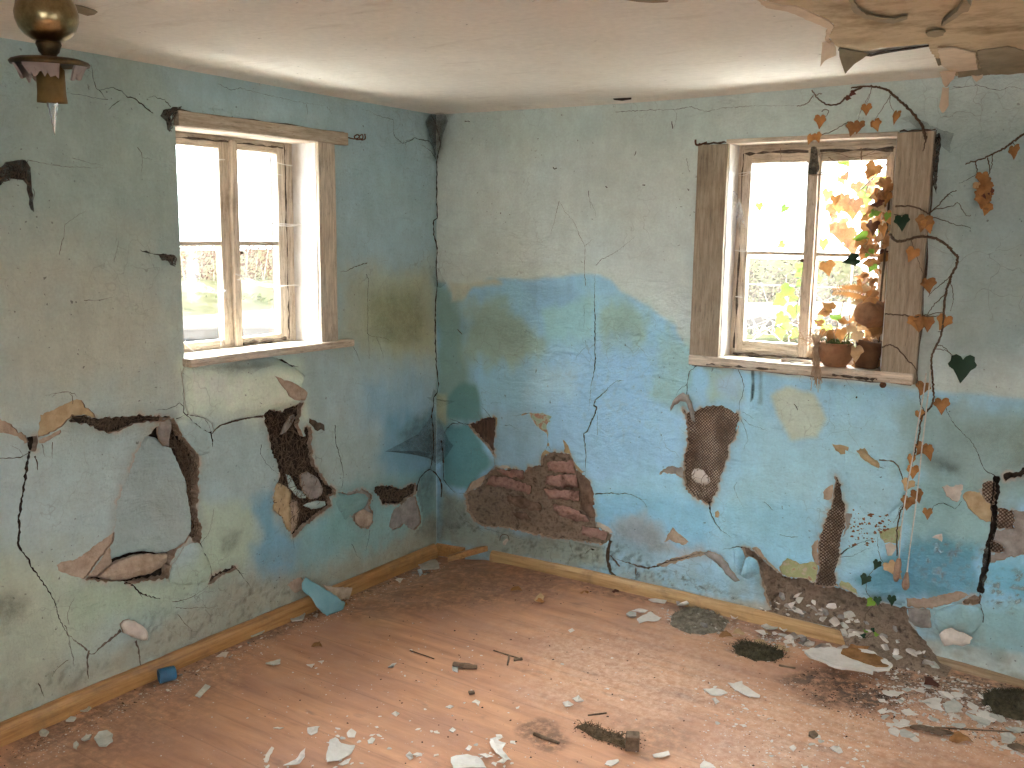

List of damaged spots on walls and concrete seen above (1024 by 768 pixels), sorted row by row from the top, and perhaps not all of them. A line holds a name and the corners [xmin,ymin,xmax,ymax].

crack [362,109,531,542]
crack [551,191,647,507]
crack [0,442,141,696]
spalling [0,399,236,585]
spalling [261,403,421,537]
spalling [465,413,613,546]
crack [569,539,696,579]
spalling [659,405,739,518]
spalling [656,476,982,646]
crack [946,408,1000,622]
spalling [942,467,1024,563]